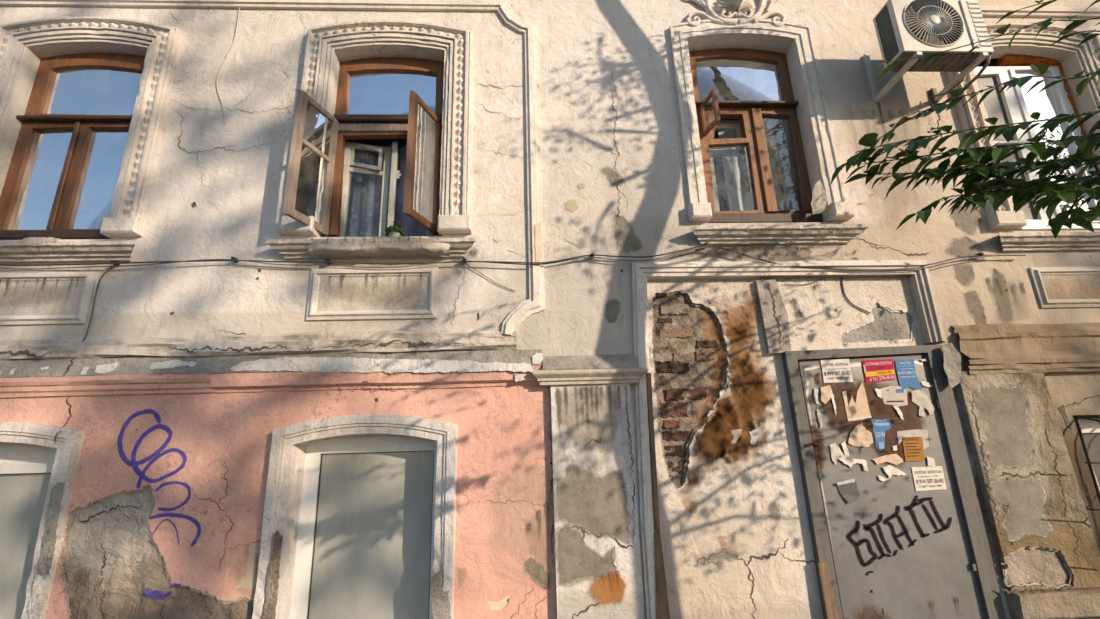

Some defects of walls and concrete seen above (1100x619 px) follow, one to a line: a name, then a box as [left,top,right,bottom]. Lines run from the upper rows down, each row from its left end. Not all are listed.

crack [173,17,306,186]
crack [0,349,75,445]
peeling [230,352,543,382]
water stain [556,385,629,431]
flaking render [652,291,728,489]
spalling [840,302,915,345]
peeling [943,343,961,388]
spalling [37,482,283,619]
crack [195,436,261,573]
spalling [524,464,631,590]
crack [694,539,815,619]
peeling [974,383,1073,588]